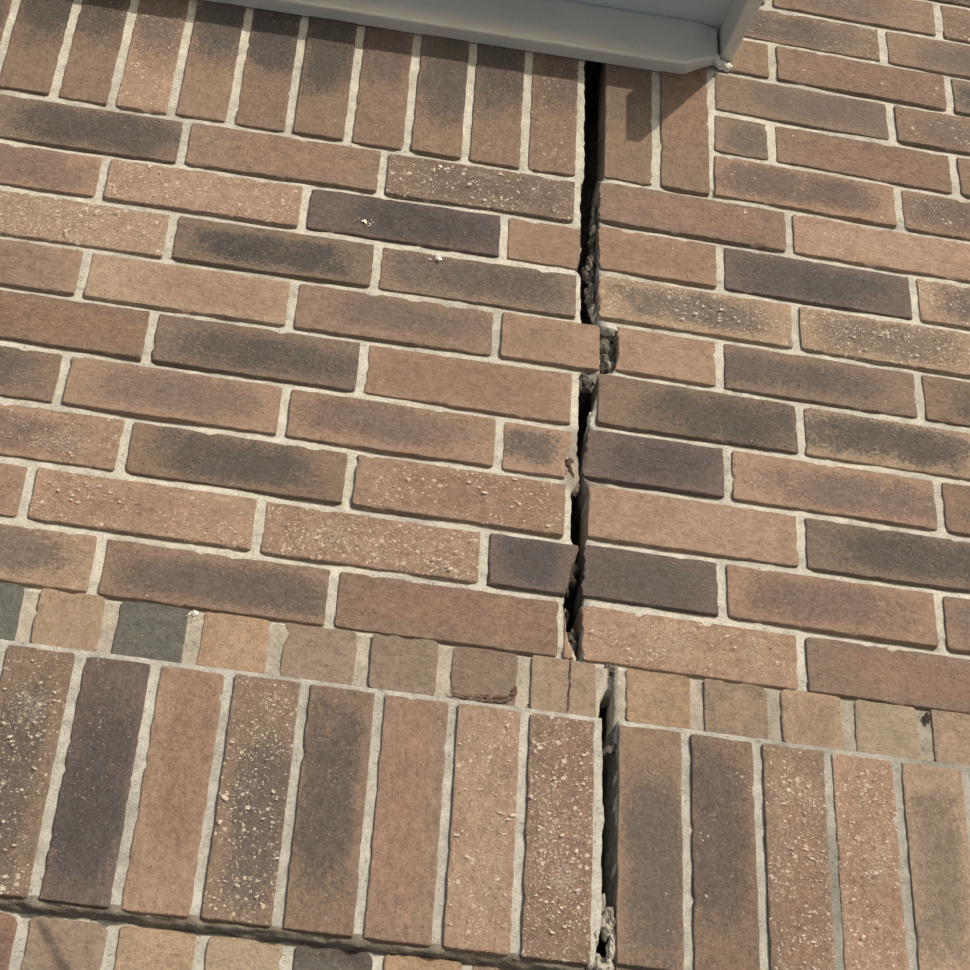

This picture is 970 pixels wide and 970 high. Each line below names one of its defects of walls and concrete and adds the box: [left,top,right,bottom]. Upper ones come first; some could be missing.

crack [562,62,618,711]
crack [593,705,617,970]